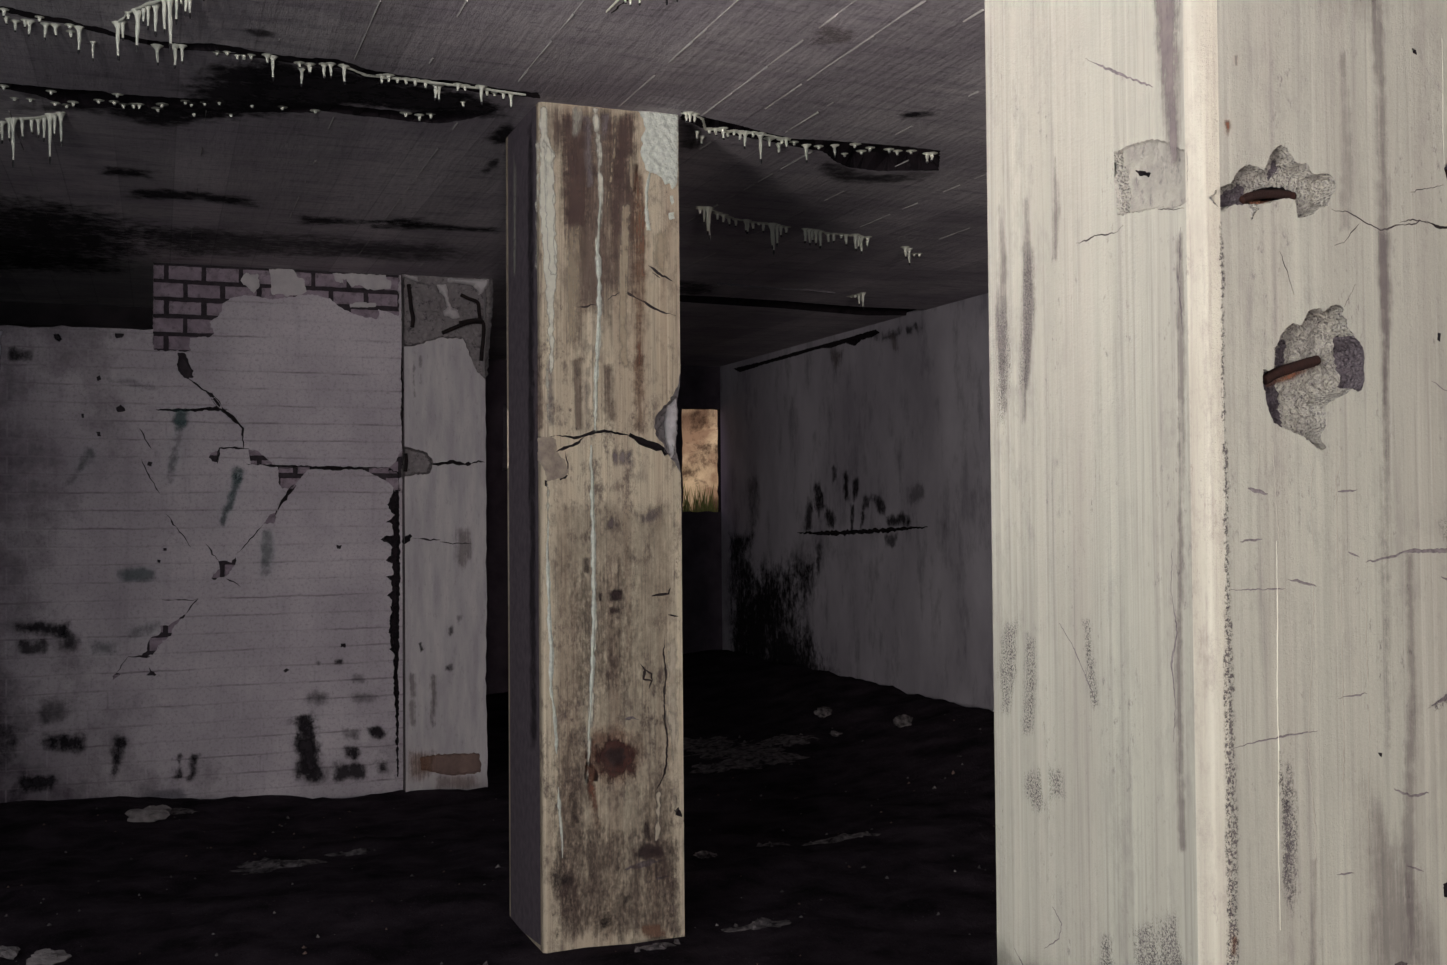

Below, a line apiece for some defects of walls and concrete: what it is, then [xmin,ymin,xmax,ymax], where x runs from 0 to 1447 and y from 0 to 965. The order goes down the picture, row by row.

spalling [1114,139,1188,216]
spalling [1209,145,1336,220]
flaking render [152,262,493,378]
spalling [1263,304,1365,450]
crack [550,429,668,475]
leakage [15,621,69,654]
crack [156,347,483,777]
spalling [1219,234,1239,965]
leakage [43,734,85,753]
leakage [111,736,127,775]
leakage [294,715,386,783]
rust [588,736,635,825]